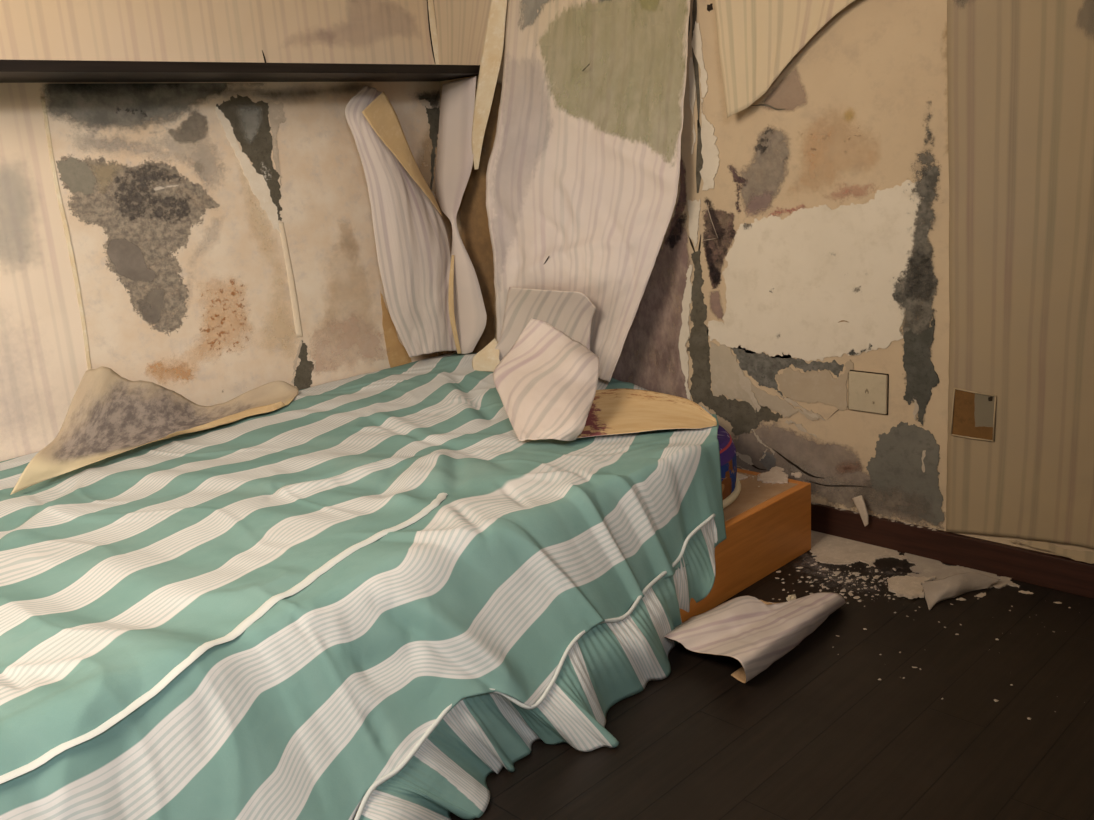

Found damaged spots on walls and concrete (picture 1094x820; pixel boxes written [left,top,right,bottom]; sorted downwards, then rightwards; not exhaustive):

water stain [45,83,227,336]
peeling [41,81,457,406]
flaking render [737,466,802,484]
flaking render [707,180,929,438]
flaking render [861,400,945,526]
spalling [950,388,996,442]